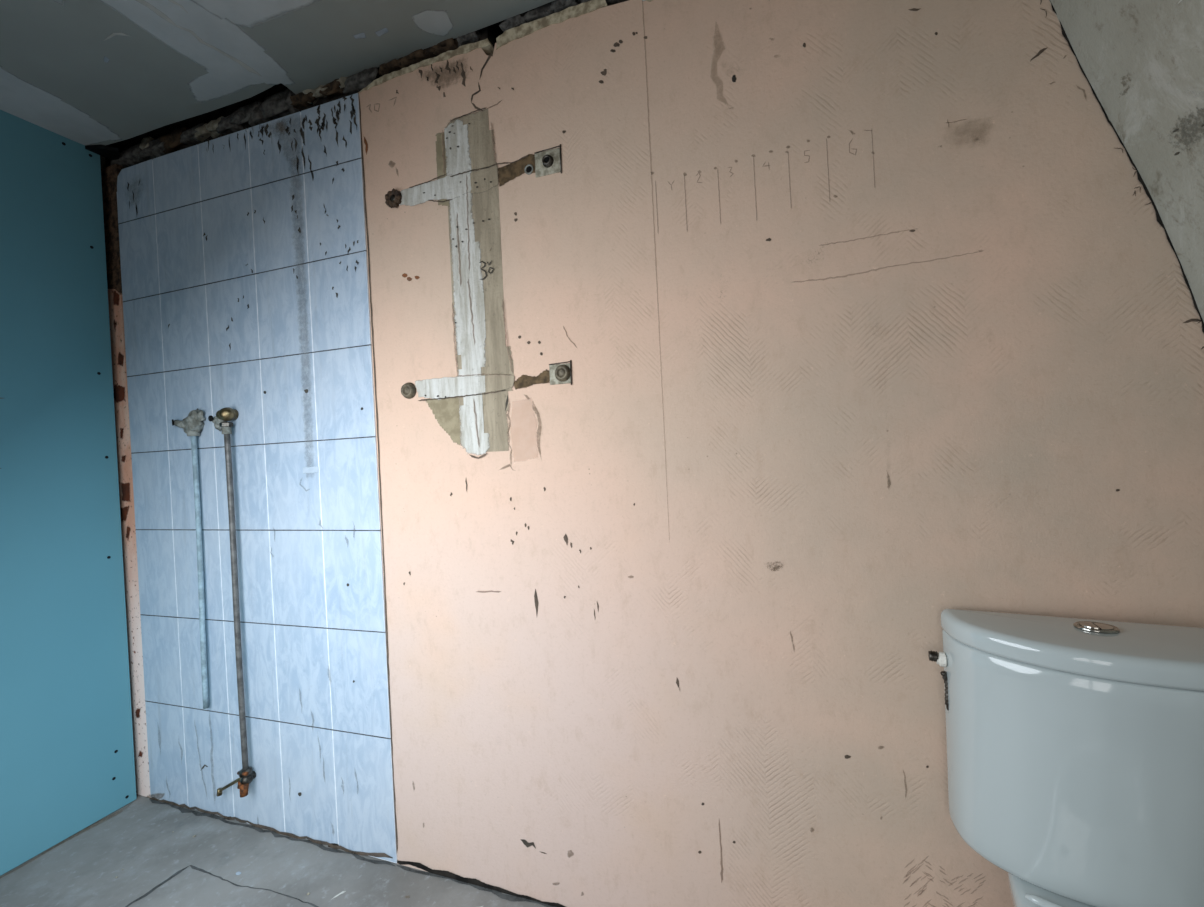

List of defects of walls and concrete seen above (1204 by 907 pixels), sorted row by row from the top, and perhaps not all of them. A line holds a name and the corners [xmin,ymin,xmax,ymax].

flaking render [359,0,608,97]
water stain [229,95,357,184]
crack [409,53,529,202]